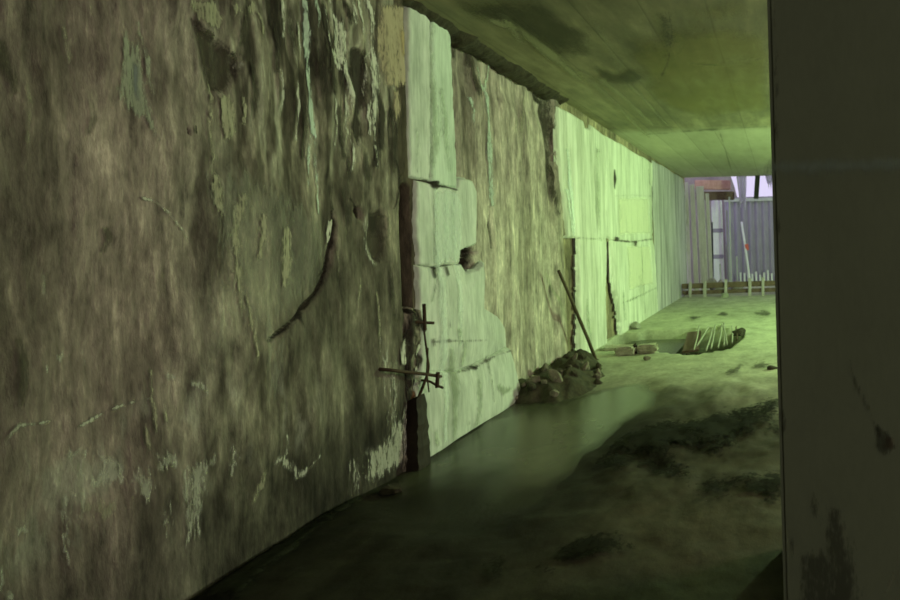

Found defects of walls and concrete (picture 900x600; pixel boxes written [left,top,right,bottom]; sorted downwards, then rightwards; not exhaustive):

water stain [464,4,589,81]
water stain [479,78,494,206]
spalling [533,92,561,214]
crack [267,185,335,342]